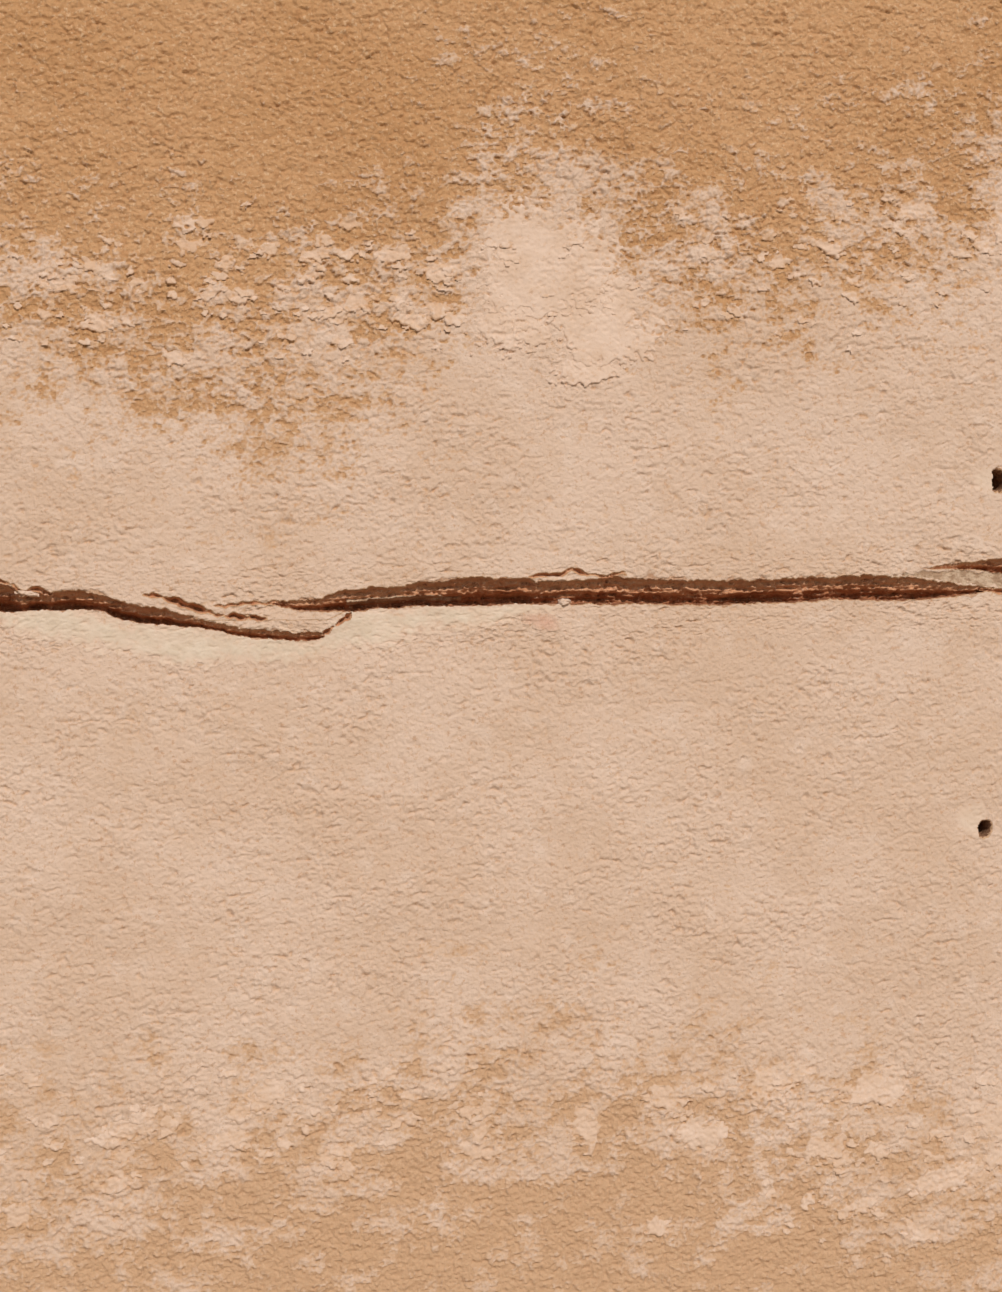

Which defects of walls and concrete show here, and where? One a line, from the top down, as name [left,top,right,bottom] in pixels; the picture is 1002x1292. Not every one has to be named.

flaking render [0,253,149,350]
flaking render [165,214,215,300]
flaking render [193,191,692,387]
flaking render [690,289,748,321]
flaking render [757,202,855,286]
flaking render [841,185,938,306]
flaking render [950,201,1002,272]
flaking render [156,348,191,367]
crack [0,559,1002,641]